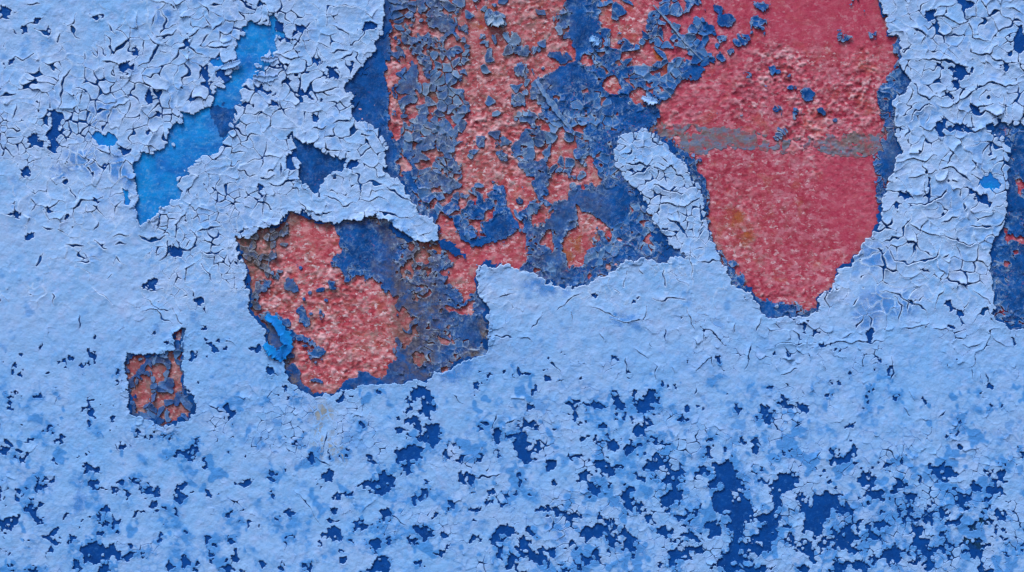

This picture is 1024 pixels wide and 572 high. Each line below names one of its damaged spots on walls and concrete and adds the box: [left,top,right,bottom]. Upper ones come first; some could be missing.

crack [17,3,87,107]
crack [7,189,224,298]
crack [105,7,227,65]
peeling [91,0,323,241]
crack [261,166,411,218]
peeling [228,0,923,564]
crack [627,150,715,272]
crack [886,4,1014,330]
peeling [935,62,1024,346]
peeling [81,319,236,470]
peeling [0,452,219,572]
peeling [467,370,1024,572]